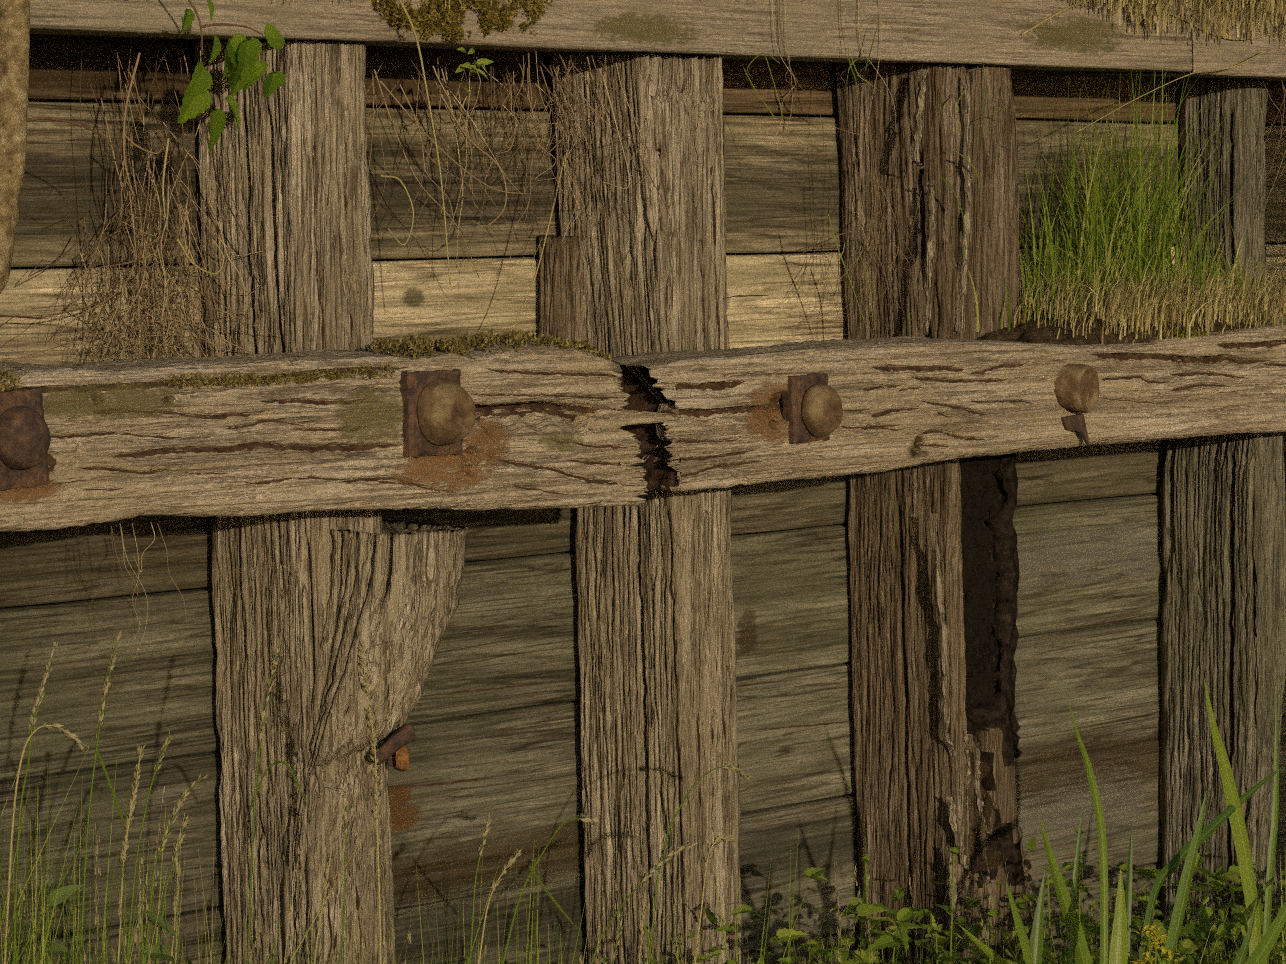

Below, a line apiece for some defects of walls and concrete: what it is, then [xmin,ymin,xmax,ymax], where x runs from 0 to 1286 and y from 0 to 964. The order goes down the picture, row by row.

crack [245,110,274,159]
crack [313,117,347,223]
crack [919,156,927,255]
crack [694,166,768,349]
crack [0,312,48,320]
crack [9,233,453,492]
corrosion [397,420,508,489]
corrosion [746,383,788,442]
crack [841,323,1034,447]
crack [1092,339,1286,404]
crack [474,368,782,957]
corrosion [388,745,421,832]